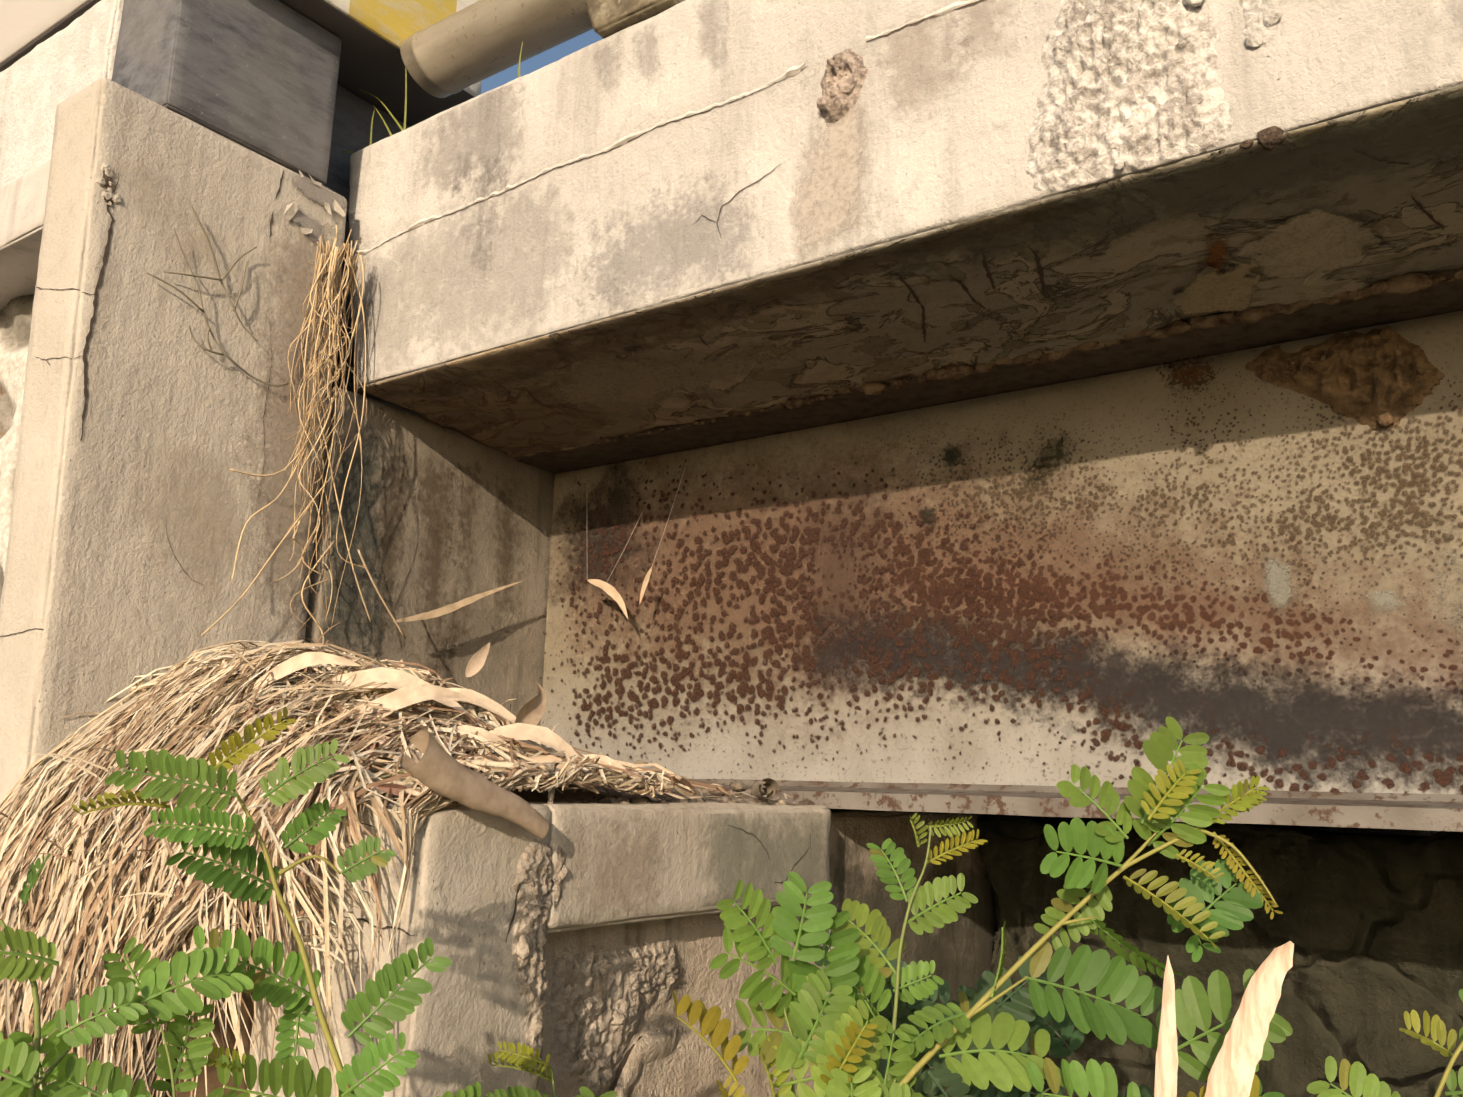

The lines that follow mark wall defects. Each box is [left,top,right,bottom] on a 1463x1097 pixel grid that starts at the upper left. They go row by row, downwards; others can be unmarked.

crack [866,0,984,42]
peeling [283,170,346,245]
crack [357,66,807,255]
spalling [1239,126,1285,152]
crack [36,171,119,441]
spalling [594,208,1463,447]
corrosion [540,356,1463,795]
spalling [548,761,556,804]
damp [813,610,1463,789]
spalling [512,839,680,1097]